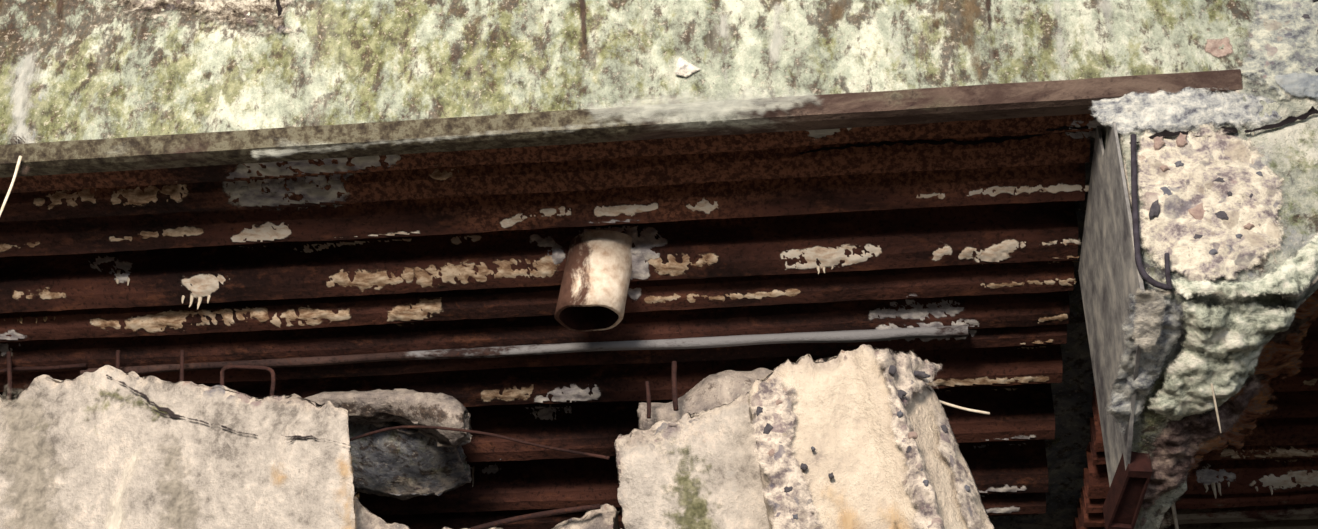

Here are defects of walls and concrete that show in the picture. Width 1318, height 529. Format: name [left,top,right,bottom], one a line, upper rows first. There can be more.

crack [258,0,285,35]
leakage [590,90,816,122]
crack [1129,106,1318,144]
leakage [223,151,420,253]
leakage [500,206,571,228]
leakage [967,184,1089,197]
spalling [1092,0,1318,529]
crack [106,374,345,444]
spalling [749,376,824,529]
spalling [876,349,945,529]
spalling [933,406,985,529]
rust [1188,289,1318,477]